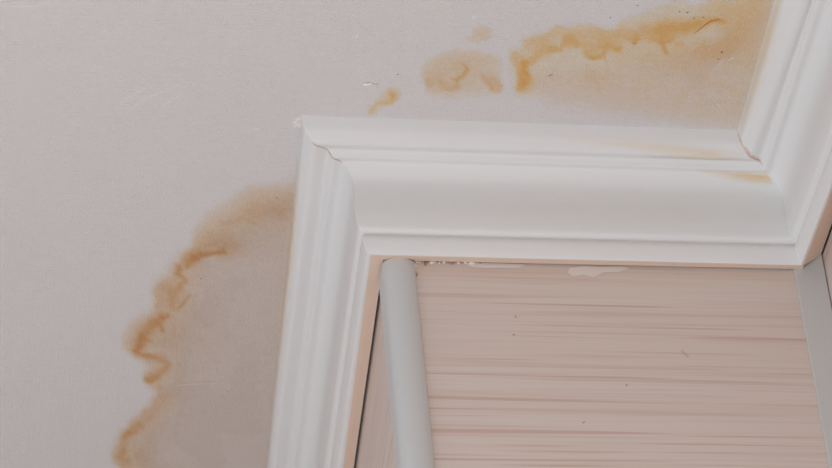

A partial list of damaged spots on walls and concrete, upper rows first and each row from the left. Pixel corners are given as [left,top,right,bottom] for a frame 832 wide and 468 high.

damp [366,87,403,116]
damp [419,0,774,130]
damp [109,175,295,468]